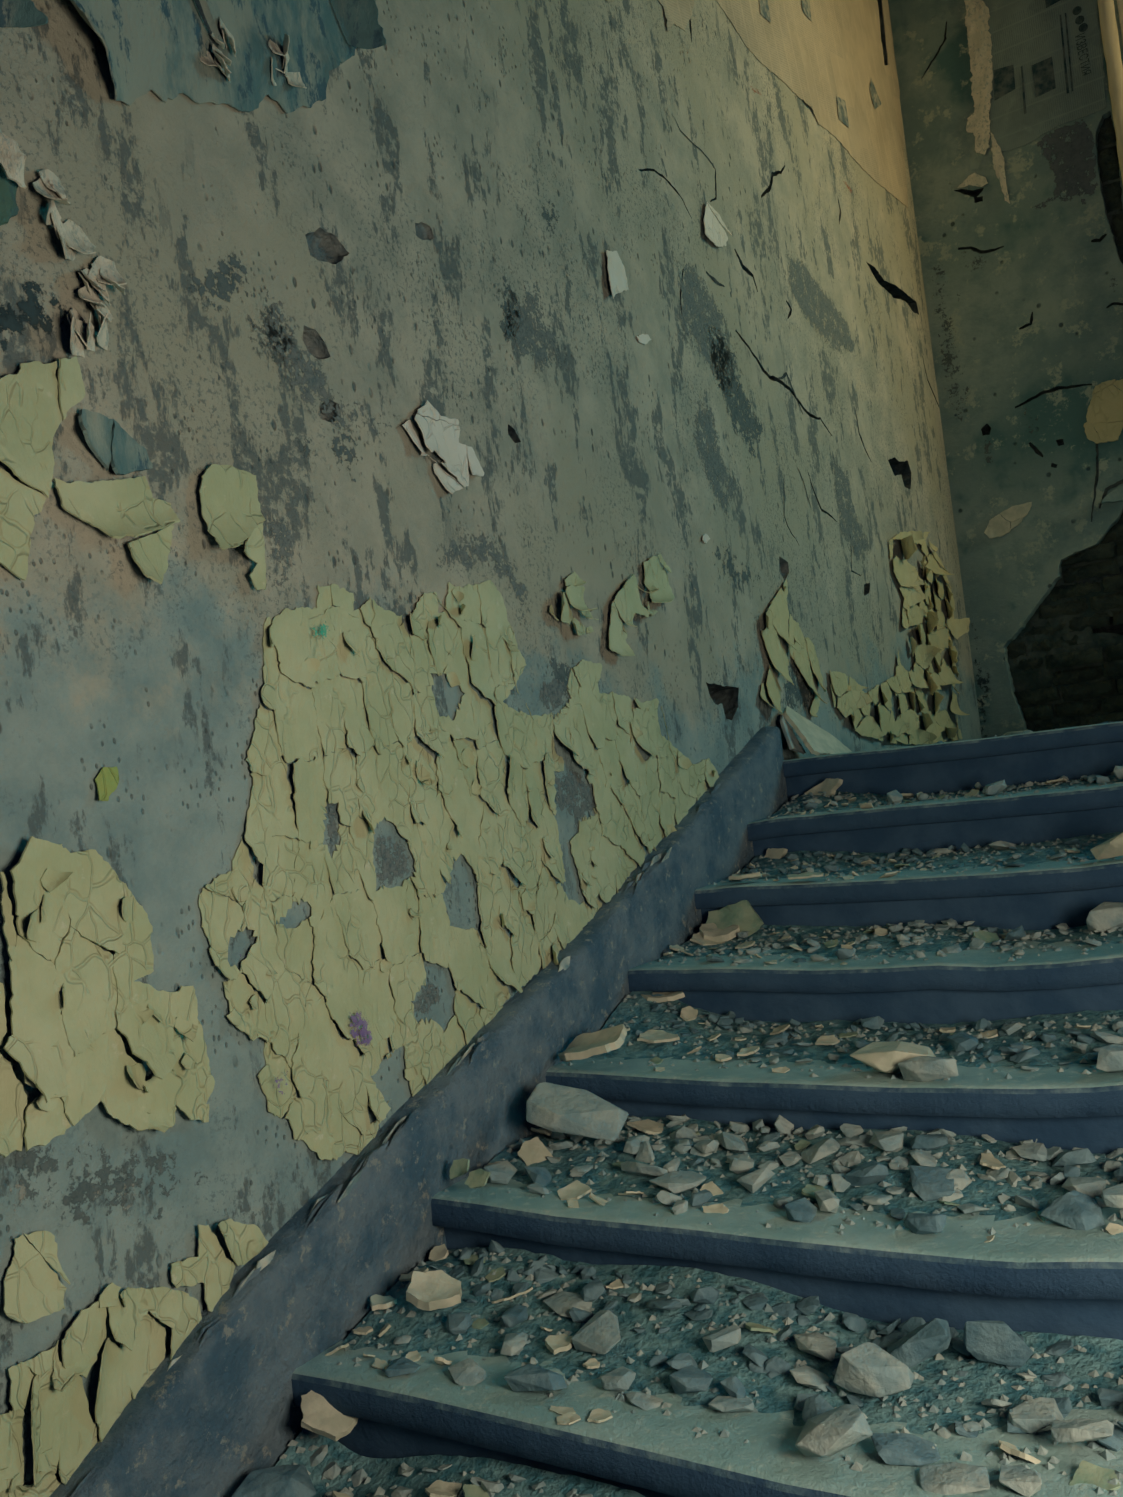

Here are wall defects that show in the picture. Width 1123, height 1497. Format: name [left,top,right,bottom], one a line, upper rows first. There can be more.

crack [639,124,717,217]
crack [680,249,792,318]
crack [761,165,785,198]
peeling [0,356,180,585]
peeling [199,464,266,590]
crack [735,329,872,463]
peeling [760,531,970,745]
flaking render [1003,508,1123,732]
crack [1091,431,1123,522]
peeling [0,836,215,1158]
peeling [198,553,723,1232]
peeling [0,1218,276,1497]